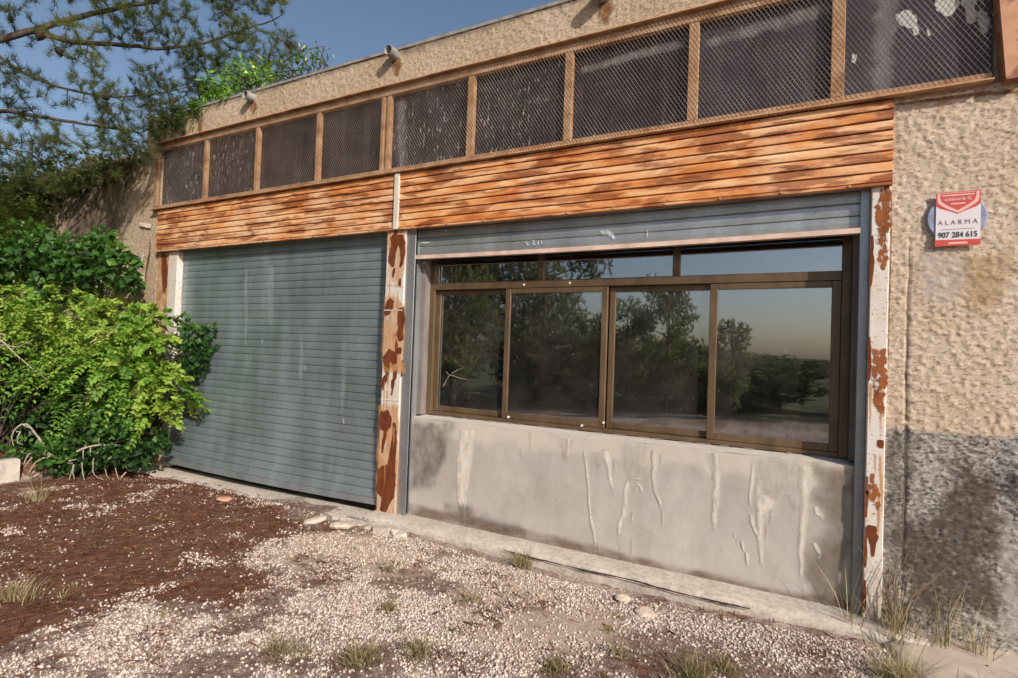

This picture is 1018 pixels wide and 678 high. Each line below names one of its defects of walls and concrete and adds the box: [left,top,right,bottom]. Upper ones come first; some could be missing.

peeling [895,0,994,36]
corrosion [869,186,894,287]
corrosion [376,230,406,513]
corrosion [867,337,889,419]
leakage [583,447,663,553]
leakage [712,452,721,528]
corrosion [863,440,884,567]
leakage [887,466,1018,618]